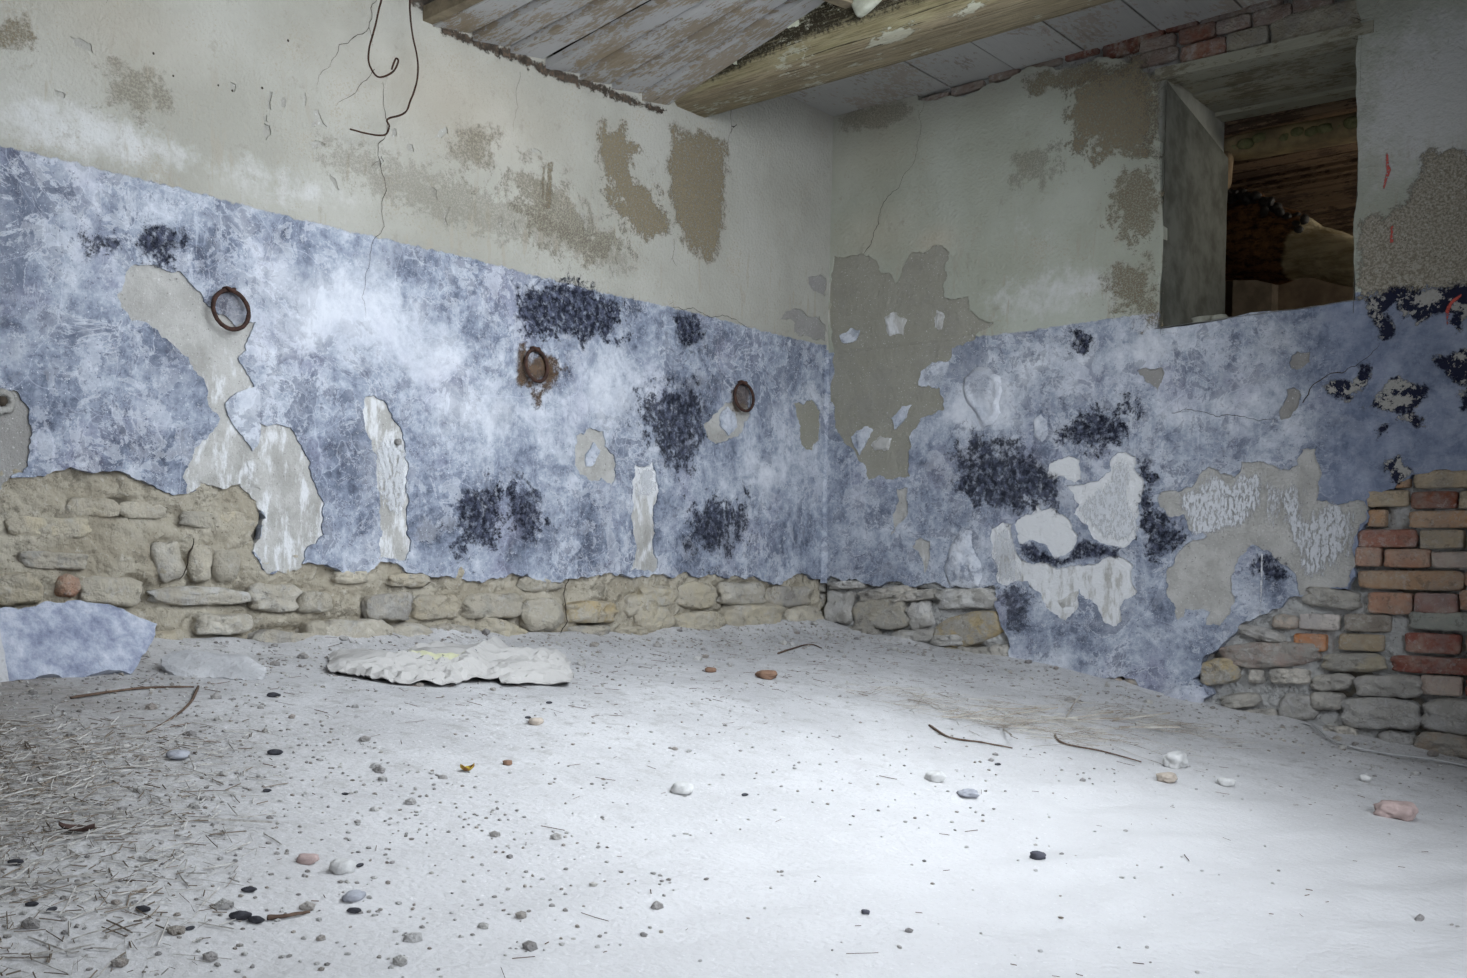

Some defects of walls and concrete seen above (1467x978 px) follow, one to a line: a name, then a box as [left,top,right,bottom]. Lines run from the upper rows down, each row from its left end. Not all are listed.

flaking render [921,0,1361,101]
leakage [513,273,641,351]
rust [517,341,570,406]
leakage [625,312,754,573]
leakage [438,471,554,573]
flaking render [0,245,1467,759]
leakage [947,387,1354,636]